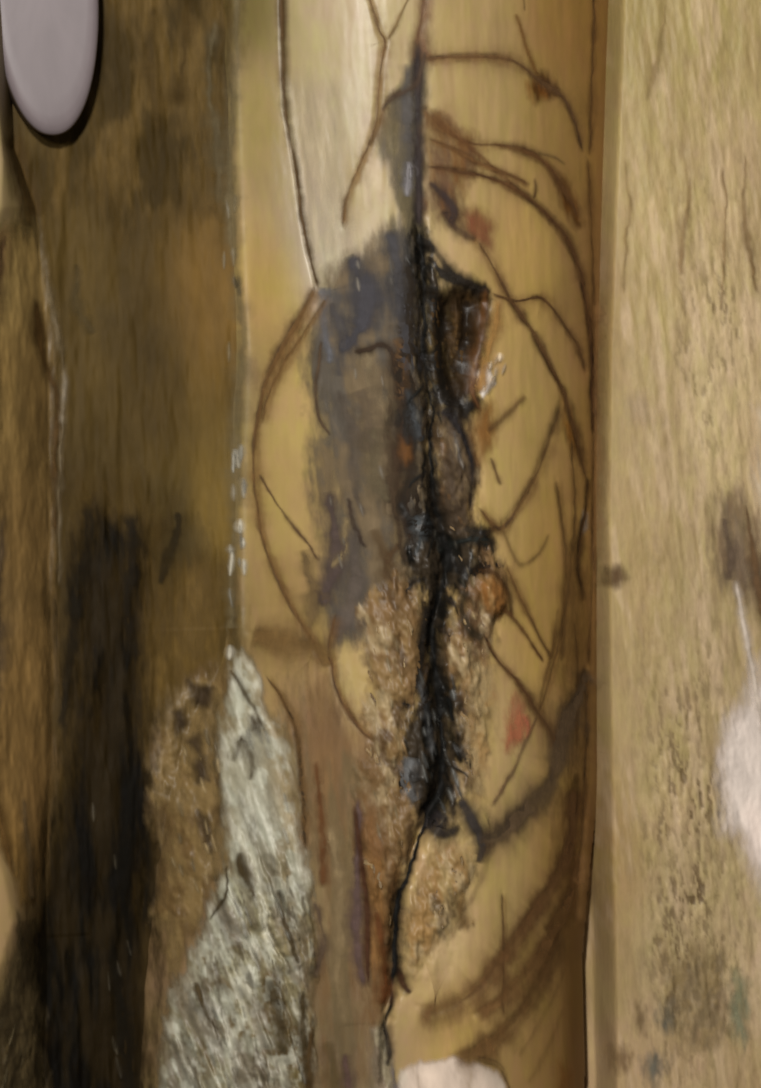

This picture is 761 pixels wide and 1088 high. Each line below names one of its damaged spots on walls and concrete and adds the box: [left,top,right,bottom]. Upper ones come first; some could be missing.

leakage [10,0,234,220]
rust [430,134,490,245]
leakage [0,498,237,1088]
spalling [150,597,320,1088]
peeling [229,521,245,573]
leakage [297,0,503,824]
spalling [354,570,478,970]
crack [342,0,596,1062]
spalling [445,451,512,795]
peeling [718,585,761,874]
leakage [719,496,761,615]
peeling [373,1026,510,1088]